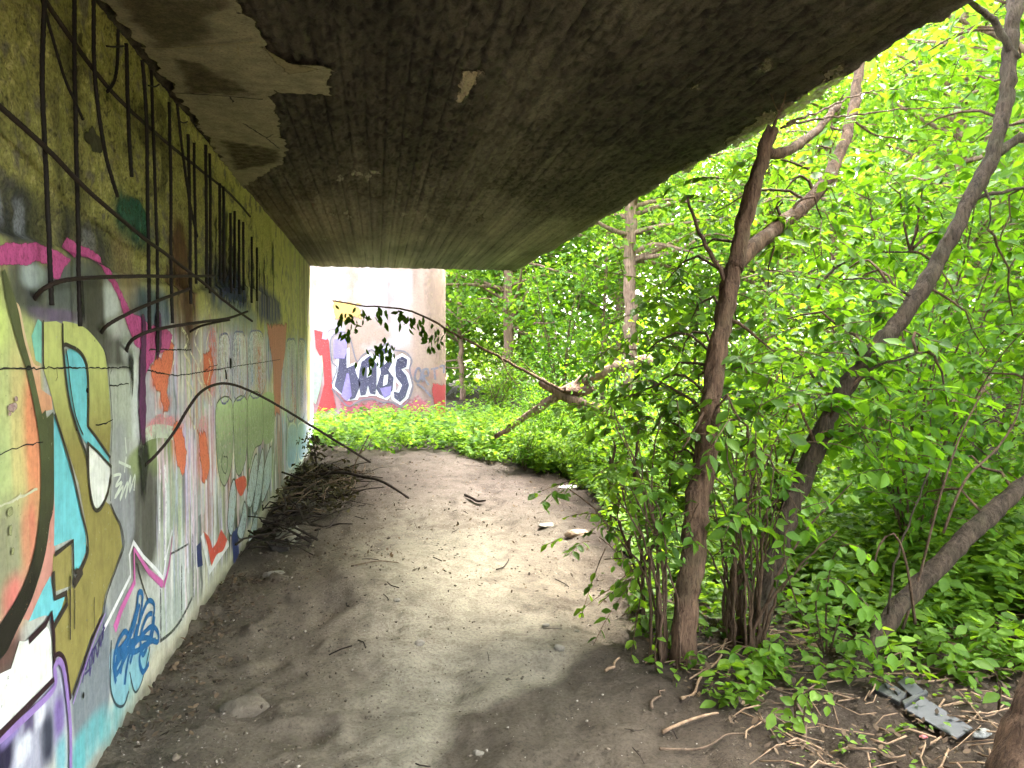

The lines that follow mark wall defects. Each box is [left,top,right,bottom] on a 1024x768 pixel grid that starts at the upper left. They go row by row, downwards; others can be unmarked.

spalling [456,69,485,104]
spalling [0,0,336,297]
crack [0,344,278,387]